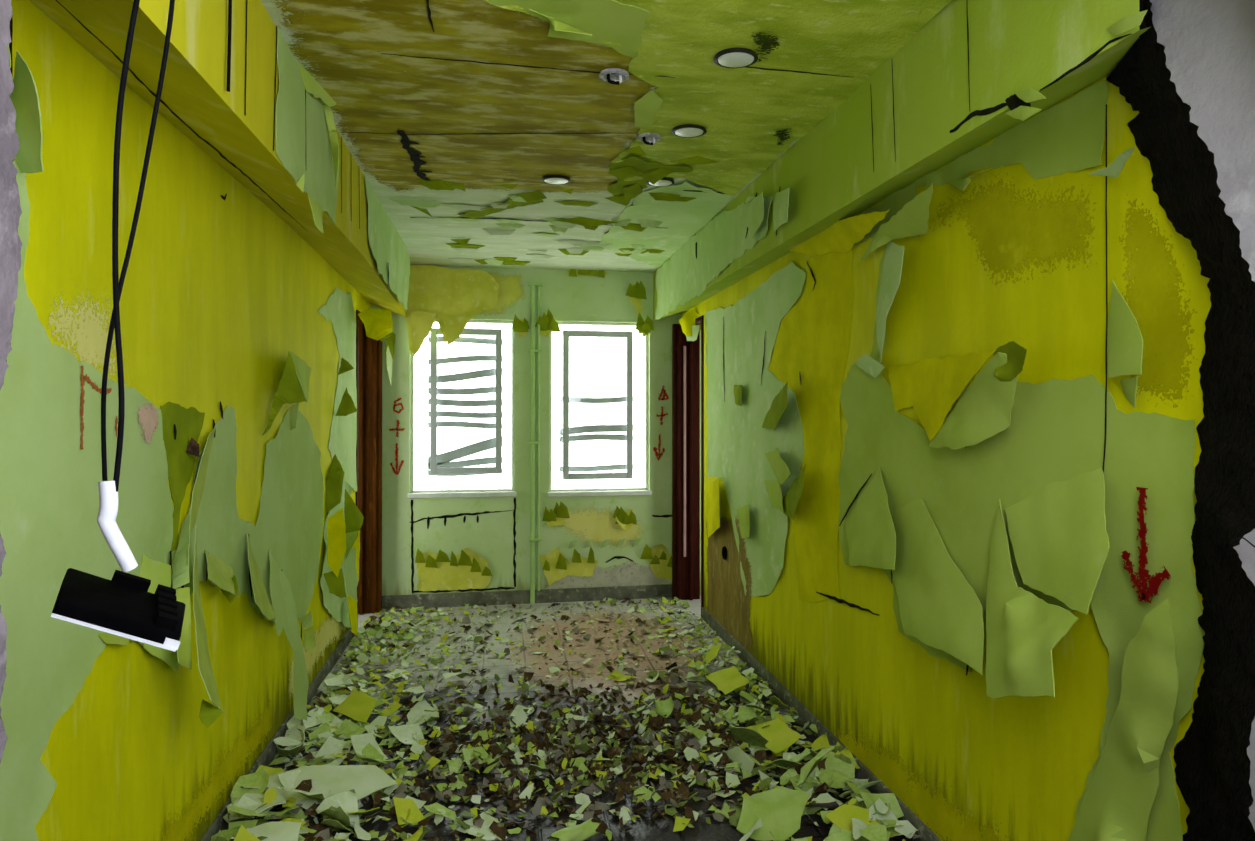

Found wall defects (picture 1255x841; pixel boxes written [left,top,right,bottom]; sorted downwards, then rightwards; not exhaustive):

crack [950,7,1007,133]
crack [1039,34,1131,92]
crack [341,130,624,229]
peeling [0,27,396,841]
peeling [364,0,1255,841]